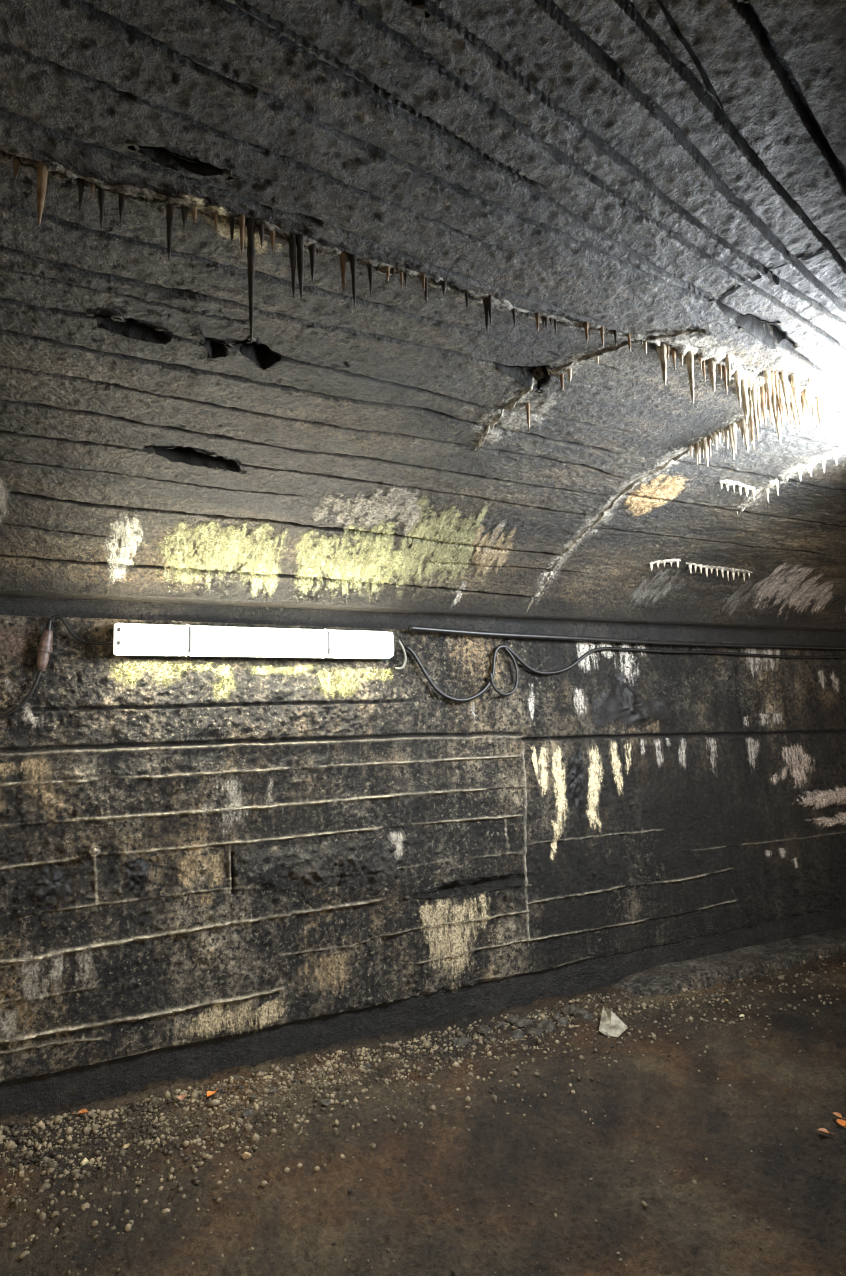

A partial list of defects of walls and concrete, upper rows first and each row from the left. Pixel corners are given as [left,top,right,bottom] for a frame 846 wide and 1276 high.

spalling [86,312,173,345]
spalling [191,334,282,369]
damp [0,150,846,615]
spalling [144,445,246,475]
damp [818,670,839,692]
damp [531,641,686,860]
damp [744,713,782,768]
damp [771,744,813,787]
damp [419,894,493,984]